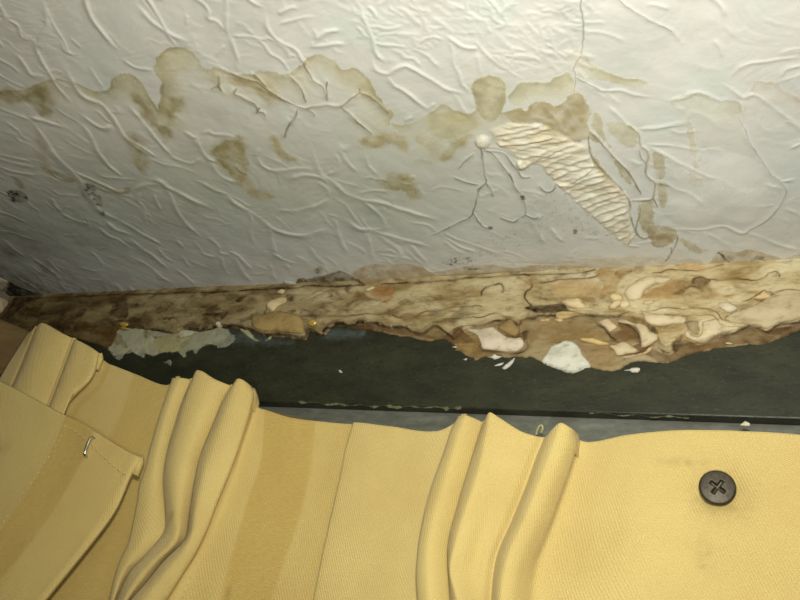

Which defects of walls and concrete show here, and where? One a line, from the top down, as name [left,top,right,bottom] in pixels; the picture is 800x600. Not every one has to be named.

leakage [126,74,174,116]
crack [218,73,293,109]
leakage [430,73,602,146]
leakage [212,140,245,176]
crack [588,136,667,239]
leakage [638,153,701,253]
peeling [109,322,235,362]
peeling [251,281,304,334]
peeling [466,319,524,370]
peeling [541,338,609,373]
spalling [599,276,800,358]
crack [737,271,788,301]